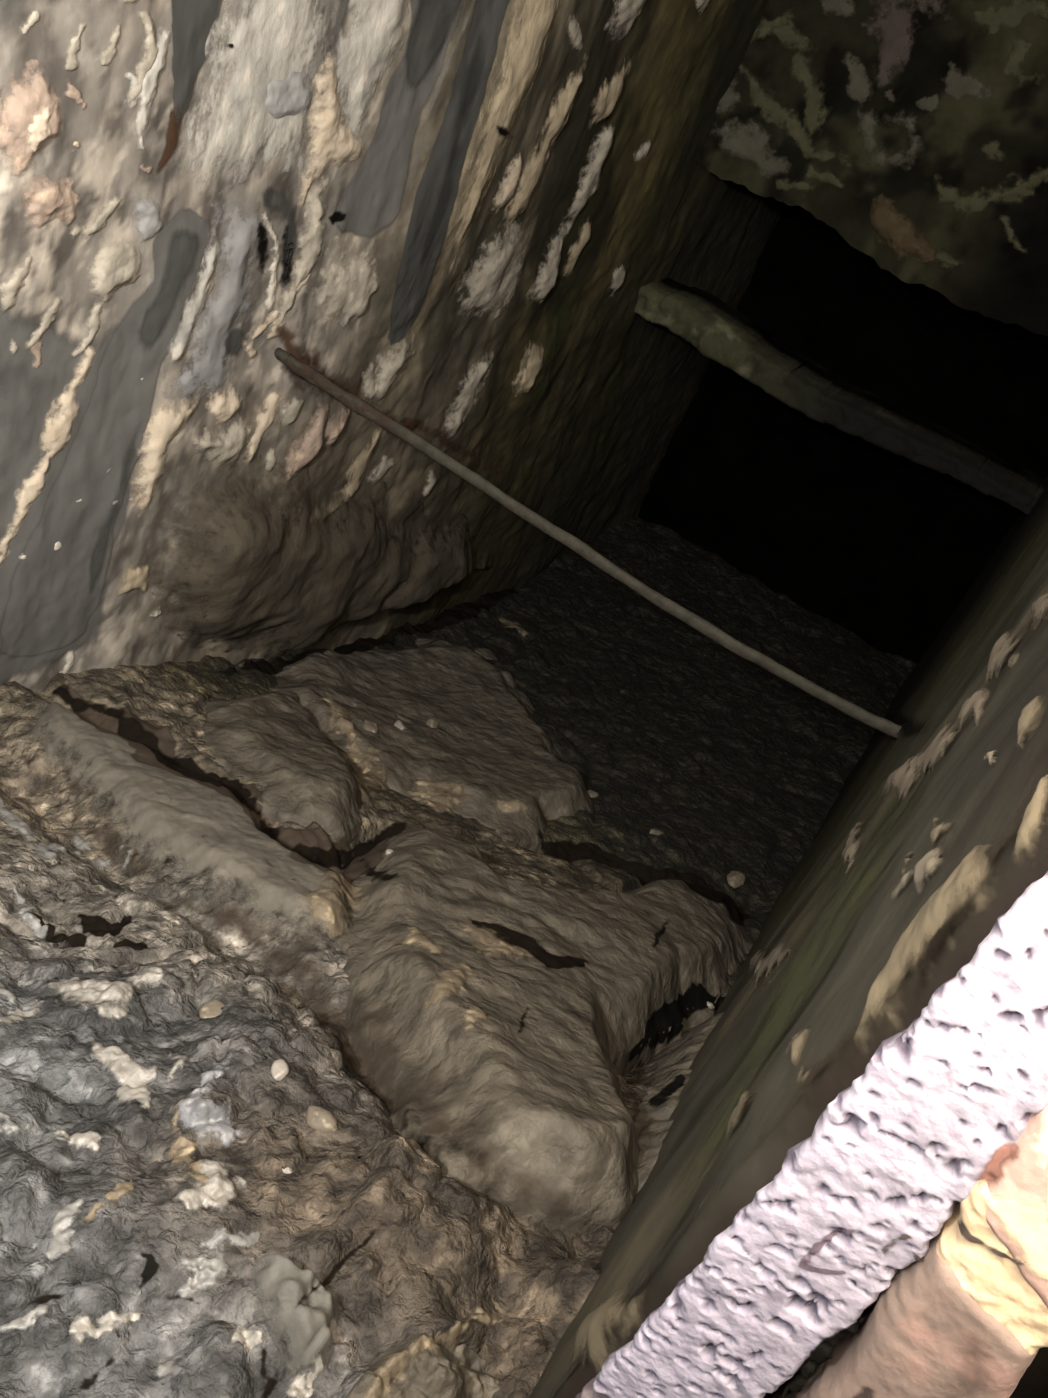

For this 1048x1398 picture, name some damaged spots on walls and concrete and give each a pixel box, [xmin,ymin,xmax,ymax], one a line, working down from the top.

leakage [157,0,222,173]
leakage [336,0,509,344]
leakage [263,214,279,309]
corrosion [277,327,361,399]
leakage [529,239,580,413]
leakage [0,209,210,682]
leakage [499,616,527,636]
leakage [320,696,390,801]
leakage [408,780,464,813]
leakage [497,797,529,814]
leakage [982,785,1048,872]